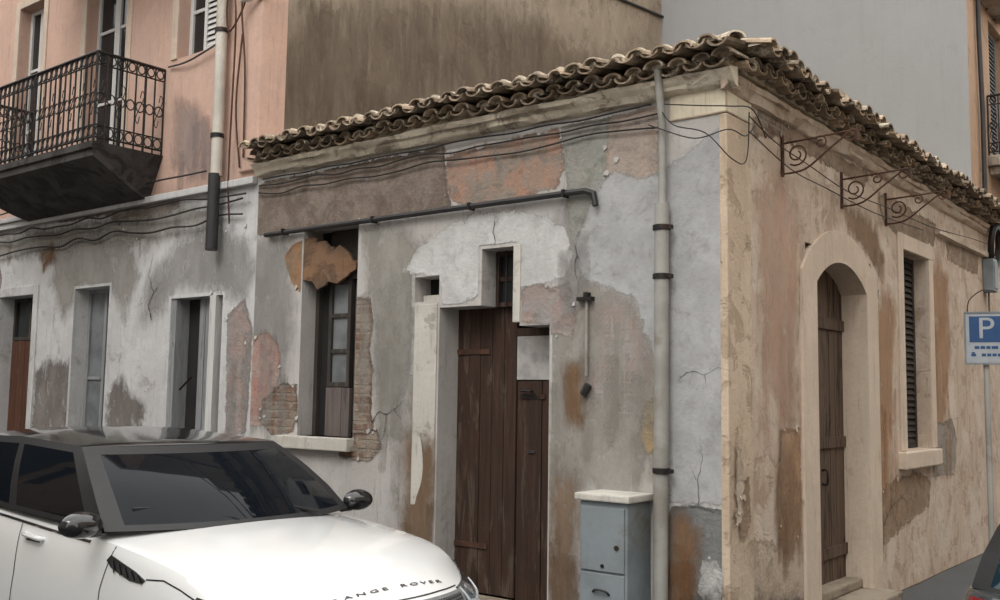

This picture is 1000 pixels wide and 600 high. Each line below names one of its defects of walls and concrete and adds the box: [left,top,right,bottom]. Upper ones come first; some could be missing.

leakage [32,360,69,428]
peeling [53,193,179,314]
leakage [106,378,144,426]
peeling [145,228,298,435]
spalling [338,288,382,462]
flaking render [244,105,658,291]